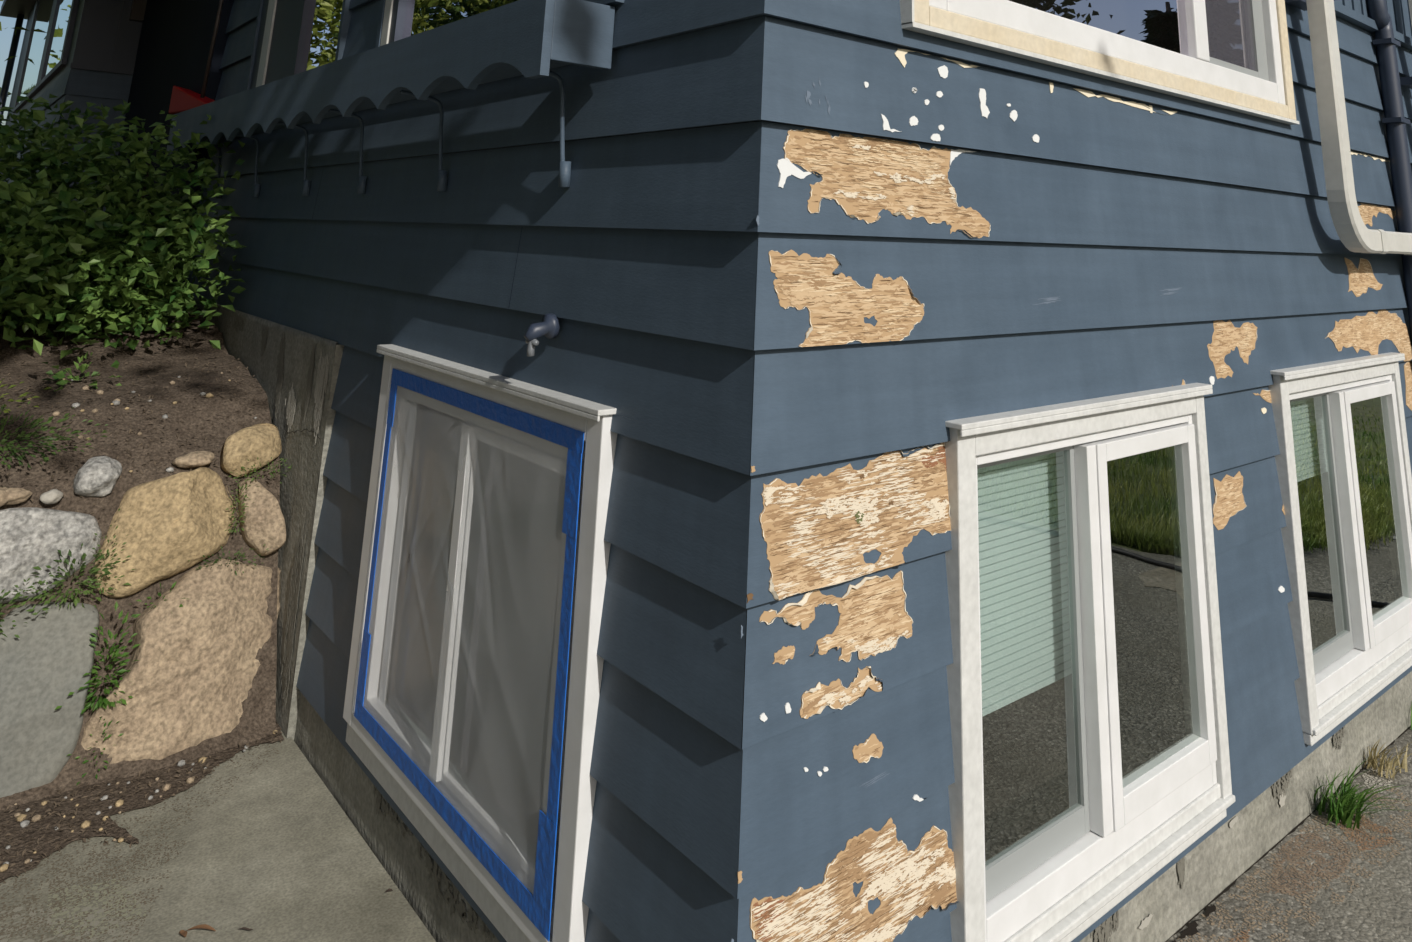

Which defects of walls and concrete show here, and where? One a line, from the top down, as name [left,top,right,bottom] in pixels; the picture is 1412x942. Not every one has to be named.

peeling [777,114,991,238]
peeling [768,250,924,347]
peeling [1344,257,1383,297]
peeling [1207,320,1258,385]
peeling [1325,309,1412,411]
peeling [1212,471,1247,530]
peeling [747,442,952,719]
peeling [750,818,958,942]